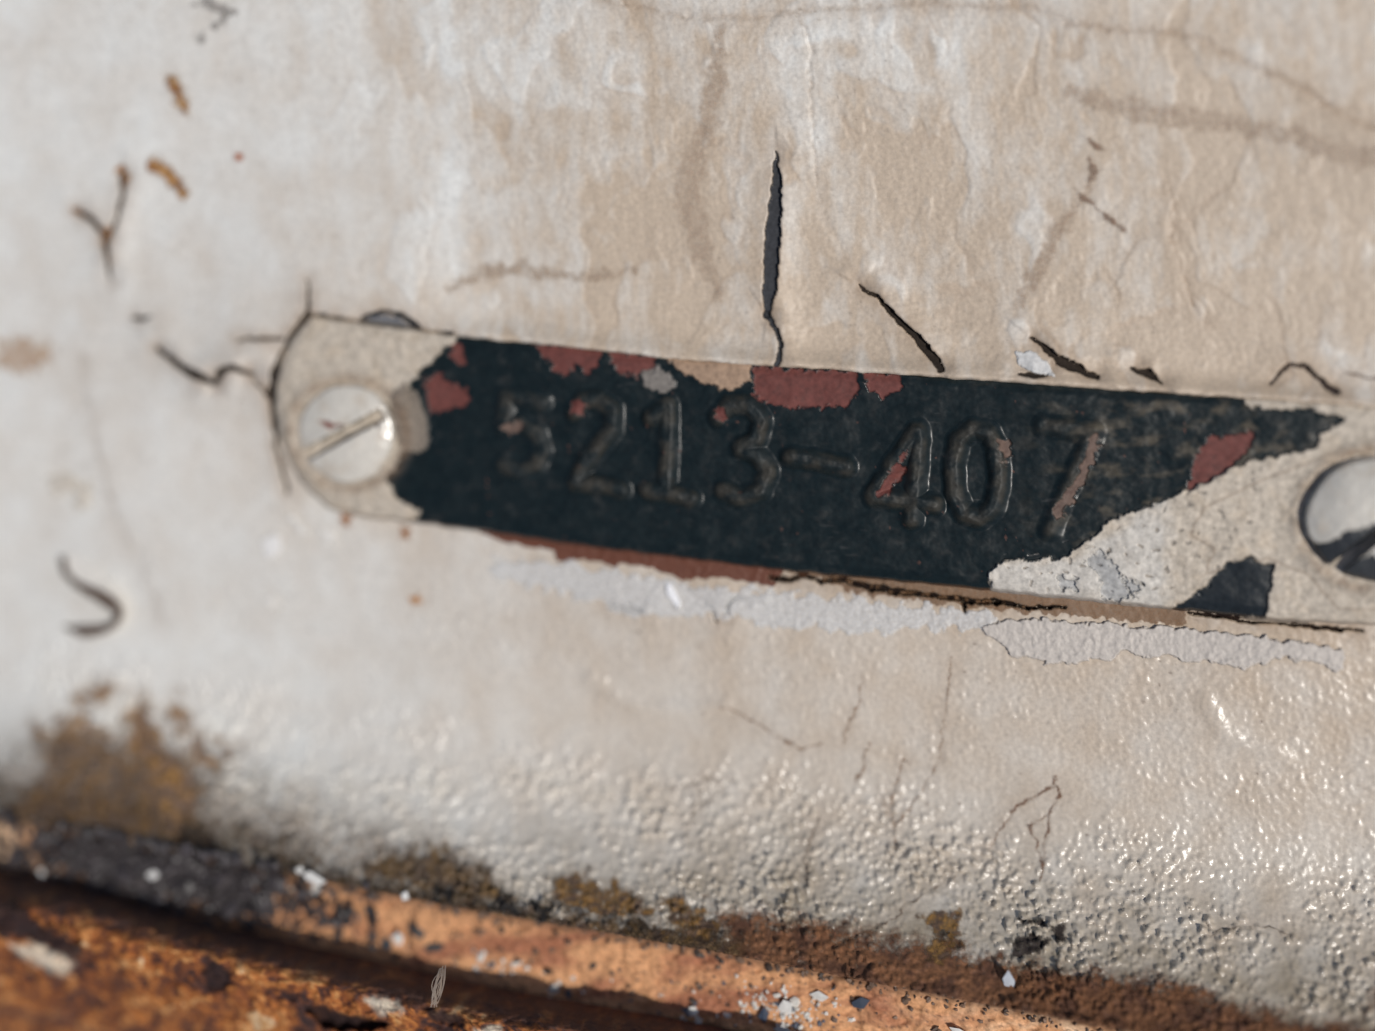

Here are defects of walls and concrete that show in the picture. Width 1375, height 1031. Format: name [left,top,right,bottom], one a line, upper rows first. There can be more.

corrosion [165,76,189,114]
crack [75,172,125,279]
corrosion [146,158,189,200]
crack [131,280,453,494]
crack [762,151,784,367]
crack [859,284,945,373]
crack [1018,337,1162,384]
peeling [59,554,126,638]
spalling [480,531,1346,673]
corrosion [0,683,232,844]
corrosion [0,868,736,1031]
corrosion [275,840,1354,1031]